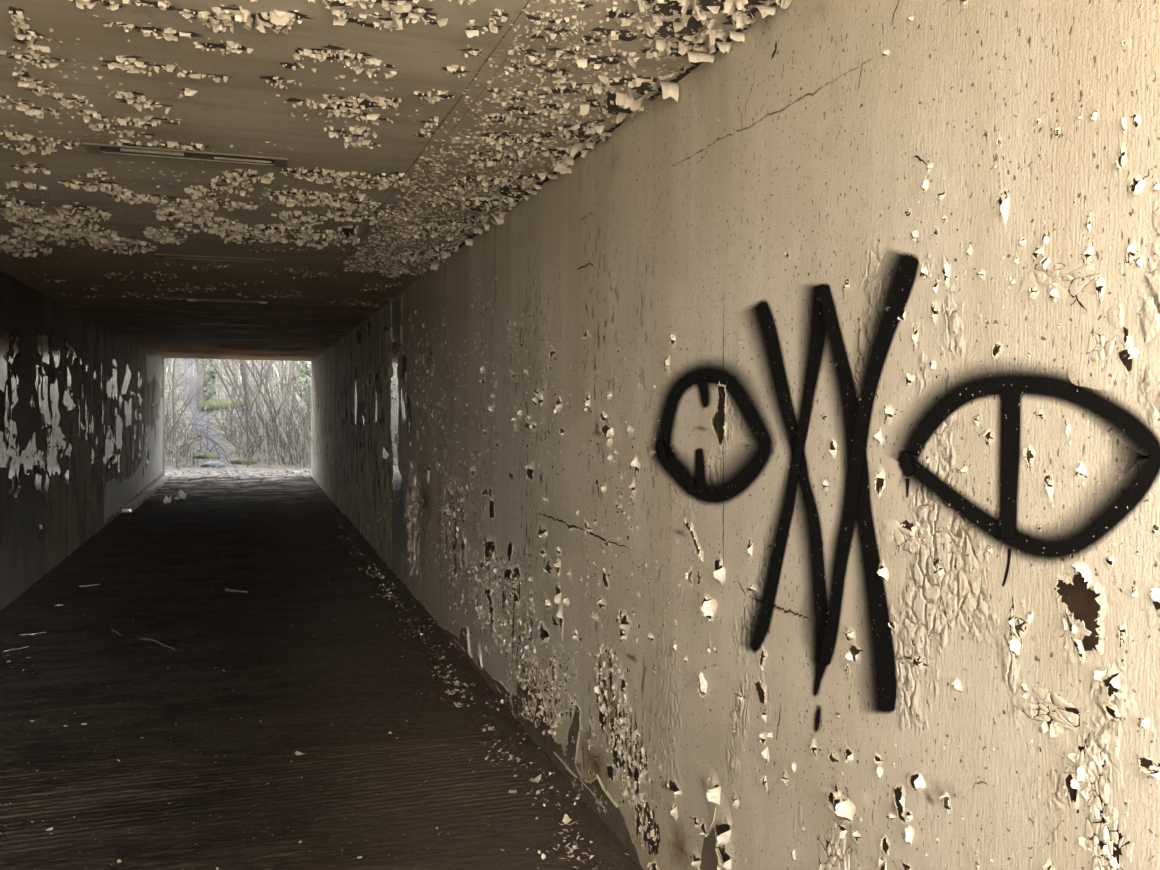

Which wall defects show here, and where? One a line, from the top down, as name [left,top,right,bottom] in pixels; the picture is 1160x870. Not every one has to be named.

crack [649,0,781,102]
crack [439,119,626,345]
peeling [981,342,1008,363]
peeling [1117,326,1140,376]
crack [536,512,636,552]
peeling [1051,556,1108,666]
peeling [1150,578,1160,613]
peeling [1013,690,1088,753]
peeling [819,761,870,870]
peeling [1033,731,1131,870]